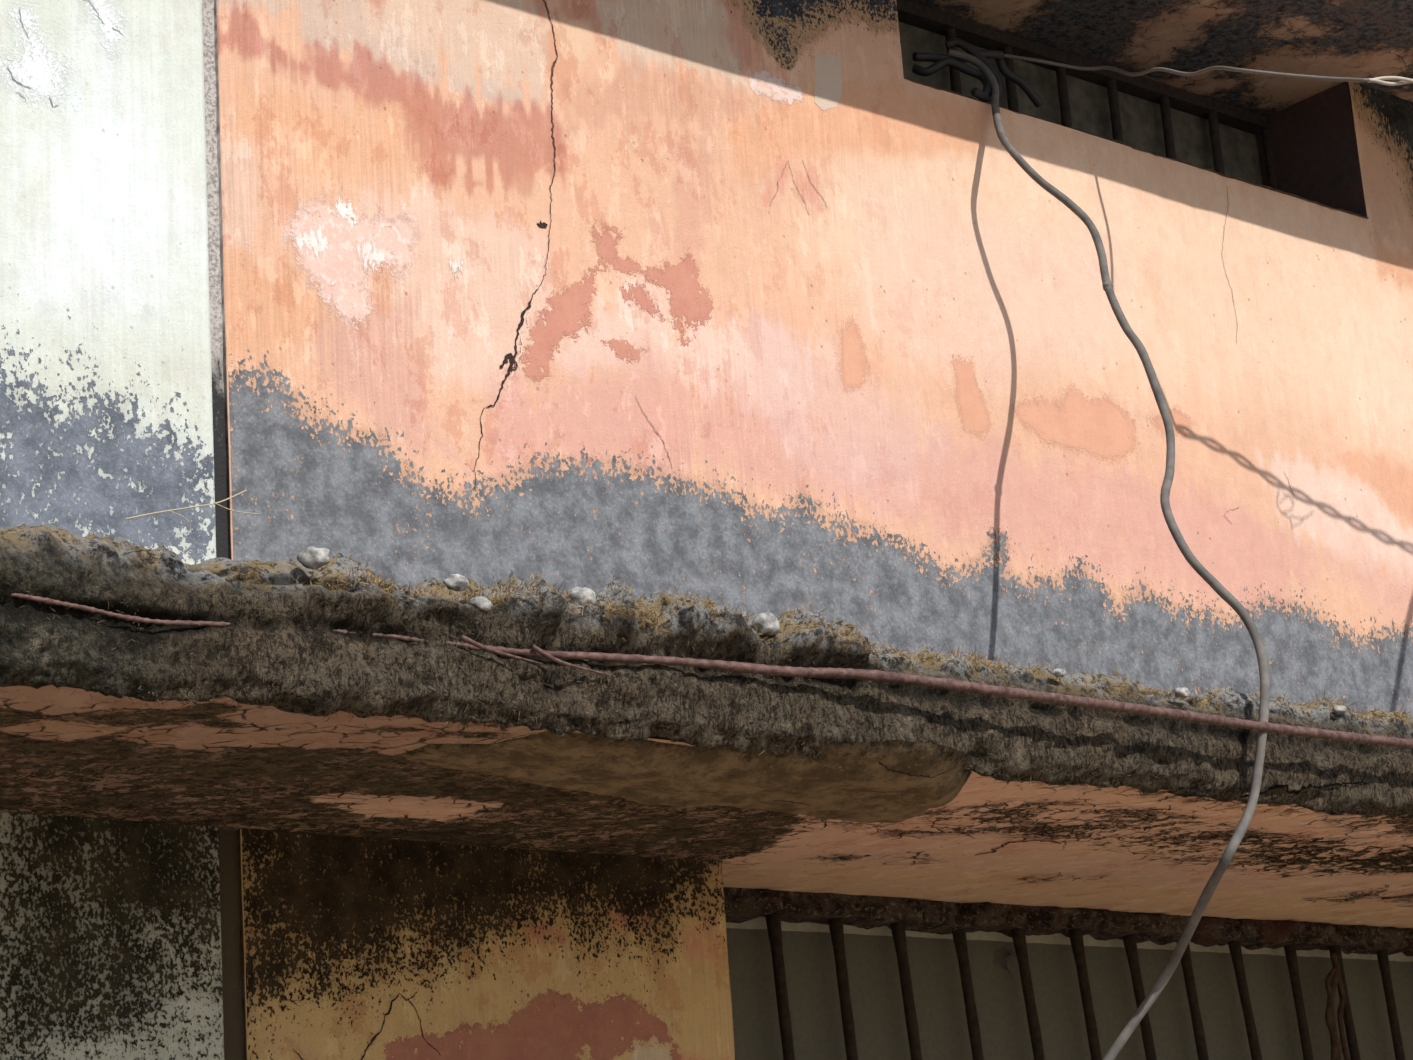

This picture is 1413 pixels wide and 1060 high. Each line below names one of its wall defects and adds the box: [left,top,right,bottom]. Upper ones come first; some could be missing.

peeling [0,0,81,124]
peeling [71,0,142,67]
crack [474,1,558,488]
damp [728,0,1413,216]
damp [0,315,1413,721]
spalling [0,524,1413,818]
peeling [382,988,682,1060]
damp [0,698,1413,1060]